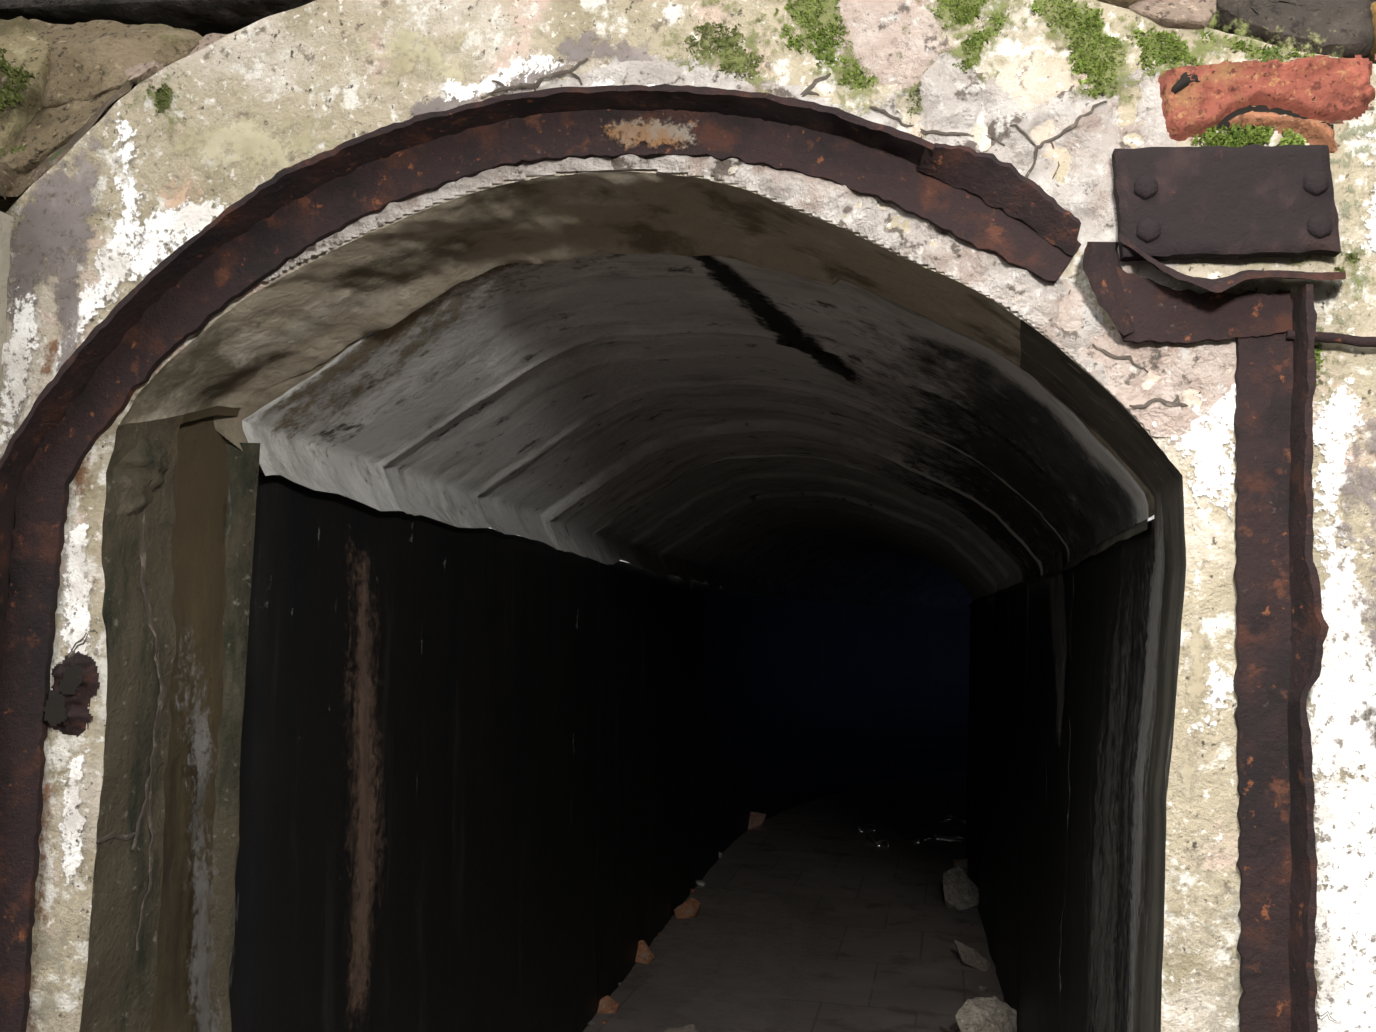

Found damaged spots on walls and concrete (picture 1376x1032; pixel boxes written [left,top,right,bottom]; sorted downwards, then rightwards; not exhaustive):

crack [869,101,1107,179]
damp [1361,132,1376,251]
corrosion [41,340,58,373]
damp [0,112,224,454]
damp [1307,367,1376,1032]
corrosion [35,783,55,946]